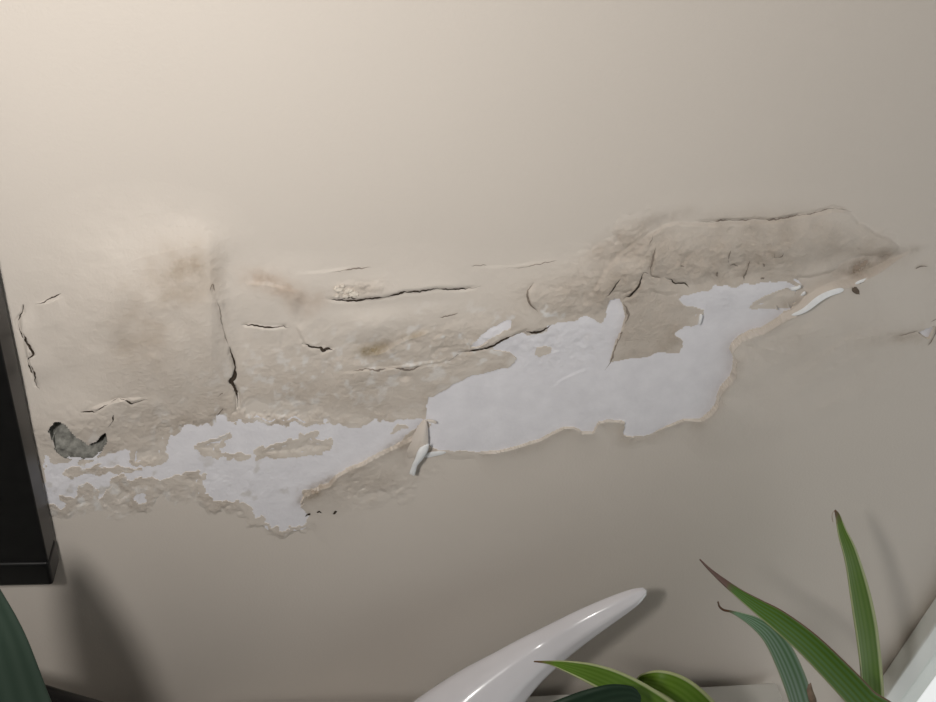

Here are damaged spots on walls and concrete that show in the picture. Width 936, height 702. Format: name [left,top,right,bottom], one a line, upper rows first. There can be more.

crack [332,264,484,302]
crack [18,293,61,386]
crack [210,284,289,415]
crack [306,344,334,352]
crack [354,365,420,373]
flaking render [38,244,936,549]